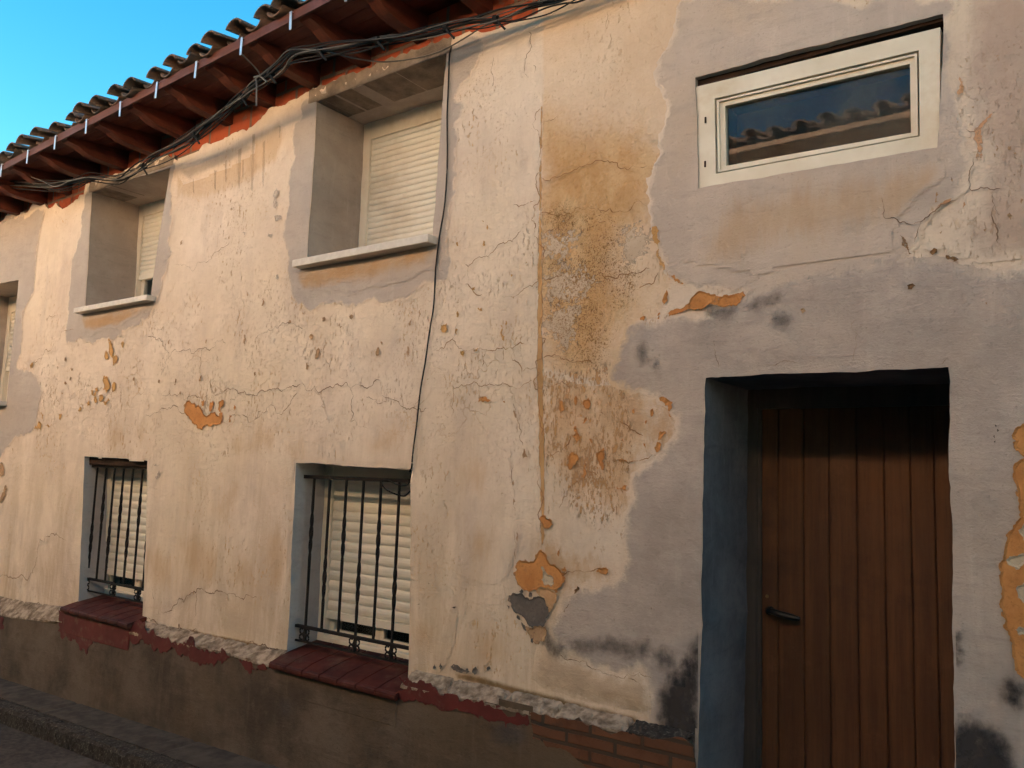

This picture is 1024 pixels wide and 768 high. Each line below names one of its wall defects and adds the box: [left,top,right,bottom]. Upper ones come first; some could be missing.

crack [882,162,1000,243]
crack [437,109,658,559]
peeling [503,0,745,644]
peeling [34,339,124,430]
peeling [174,379,236,430]
crack [147,336,426,427]
peeling [999,424,1024,678]
peeling [129,620,267,674]
crack [146,588,256,634]
leakage [658,645,698,756]
leakage [955,723,1011,768]
leakage [1004,681,1024,705]